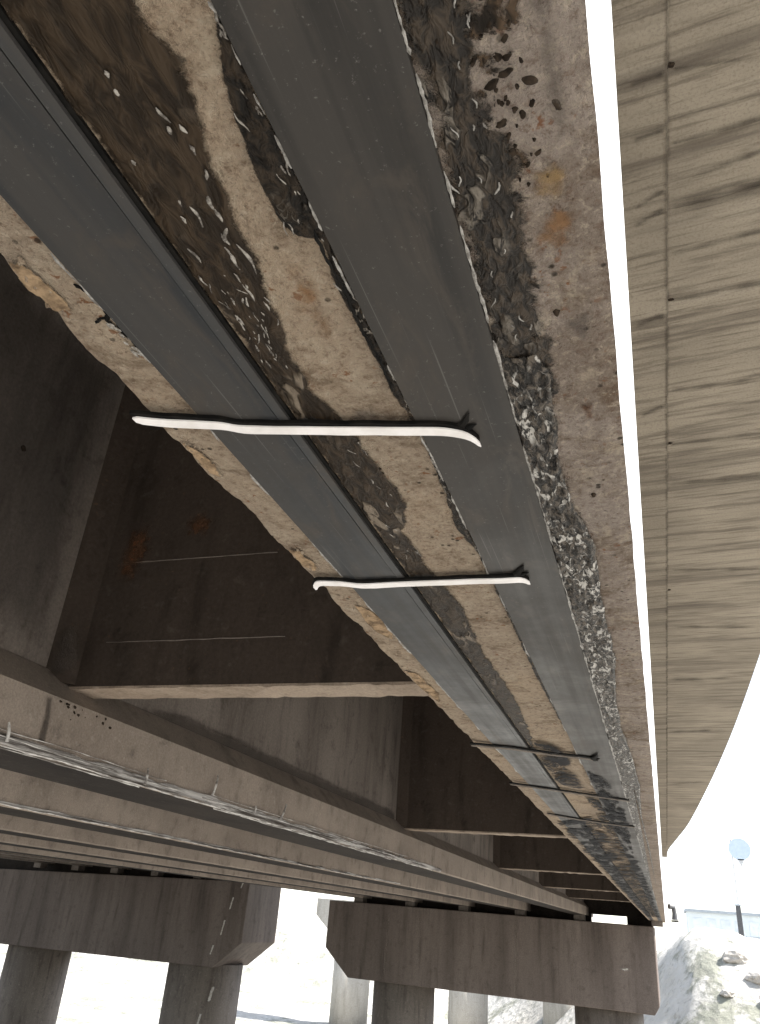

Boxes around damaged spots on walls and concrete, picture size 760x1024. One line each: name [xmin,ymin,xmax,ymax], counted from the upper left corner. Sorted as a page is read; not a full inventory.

spalling [9,256,72,312]
spalling [289,549,317,571]
peeling [501,355,655,889]
spalling [406,671,445,703]